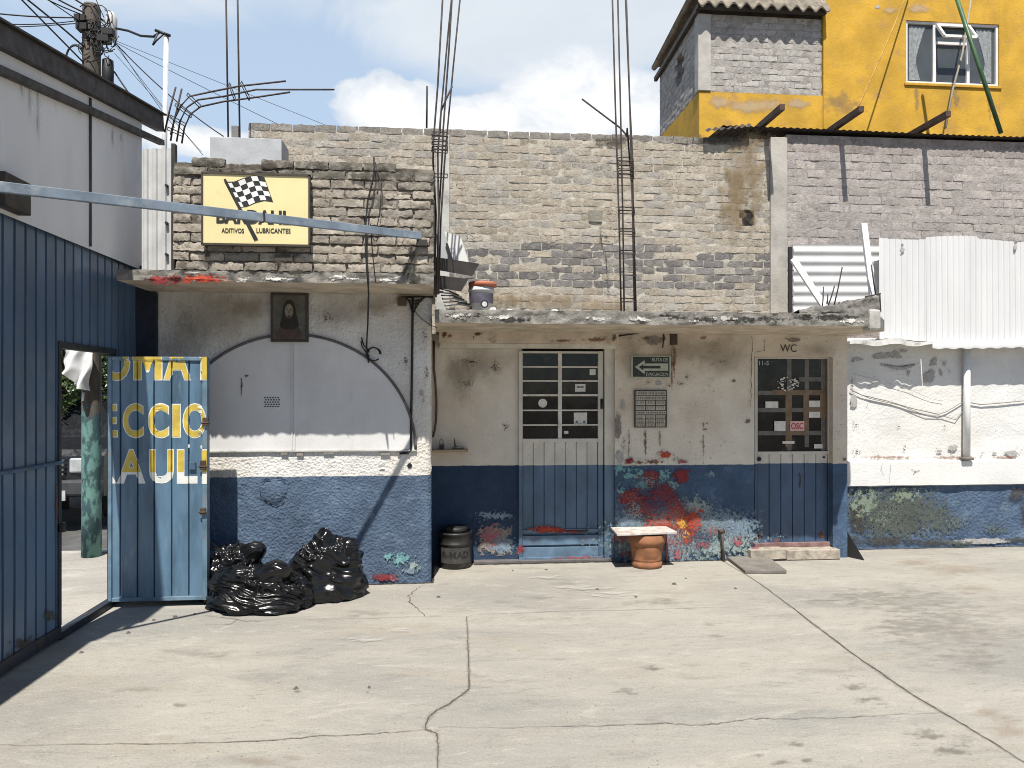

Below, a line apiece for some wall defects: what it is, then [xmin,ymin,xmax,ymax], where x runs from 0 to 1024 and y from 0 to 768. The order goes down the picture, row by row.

peeling [471,389,783,563]
crack [41,611,556,768]
crack [381,564,439,618]
crack [510,558,620,566]
crack [572,560,1024,762]